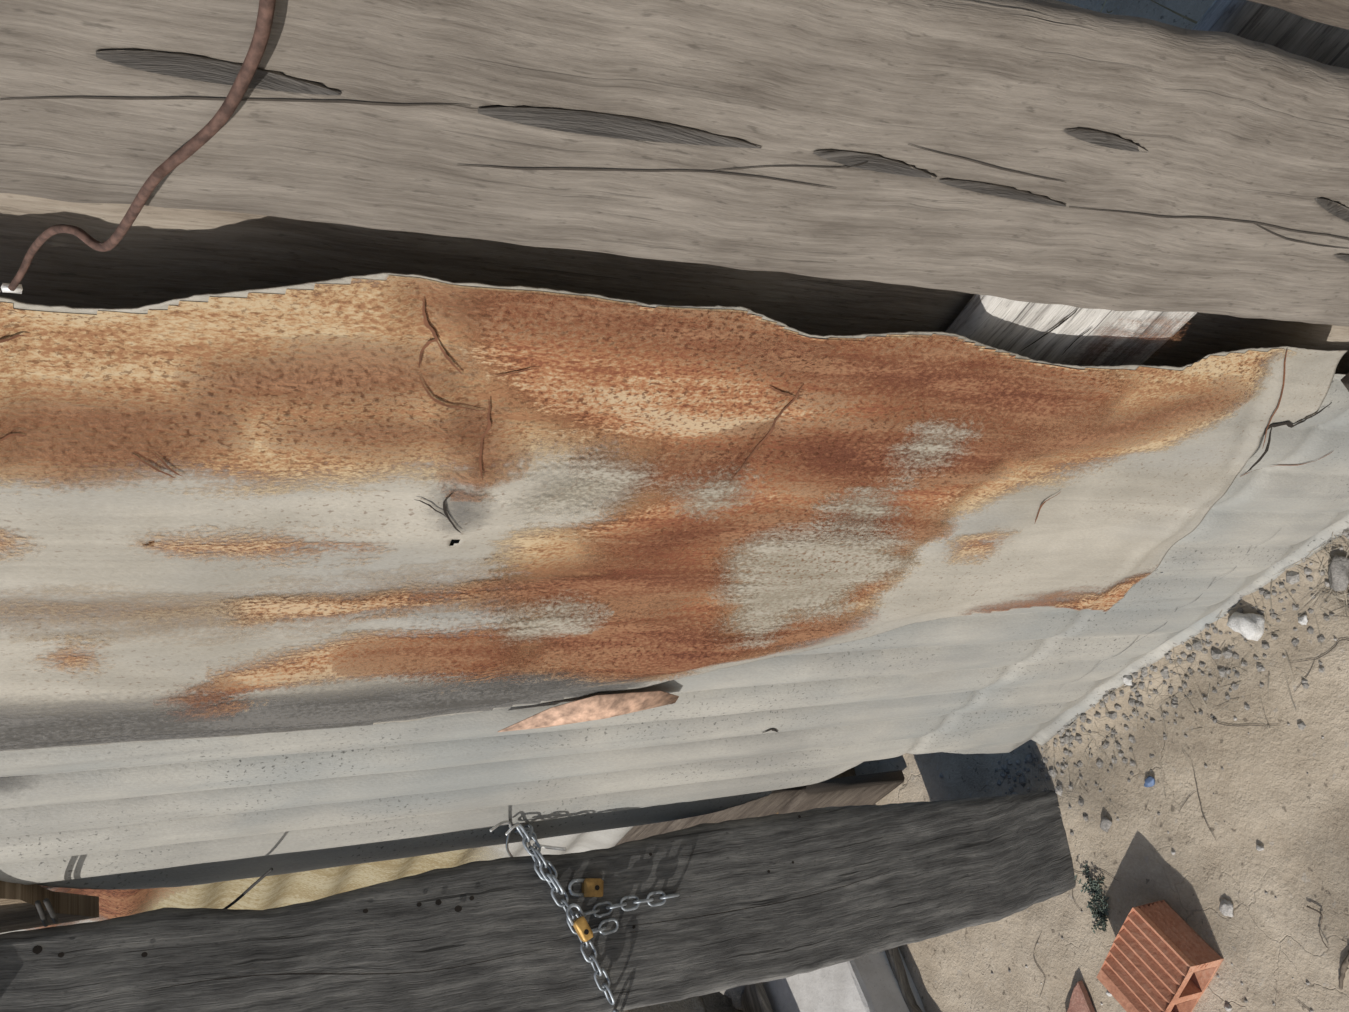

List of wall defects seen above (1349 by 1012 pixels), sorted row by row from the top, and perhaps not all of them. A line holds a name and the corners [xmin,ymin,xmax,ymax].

crack [414,299,537,533]
rust [0,275,1291,716]
crack [1240,350,1333,477]